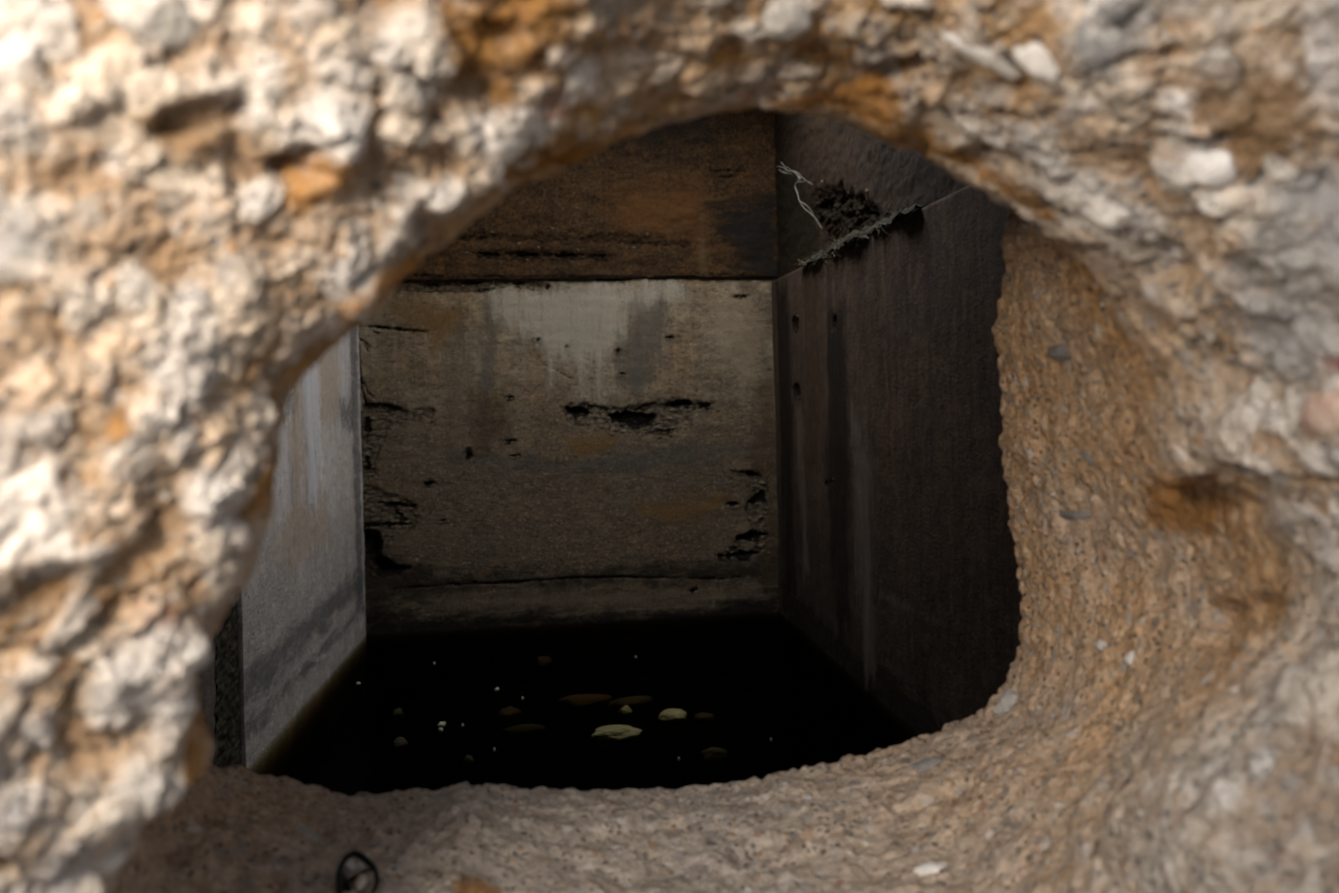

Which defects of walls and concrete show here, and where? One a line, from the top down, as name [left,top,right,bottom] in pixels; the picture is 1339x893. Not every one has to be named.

rust [519,133,594,181]
spalling [360,398,438,577]
water stain [247,281,948,738]
spalling [559,397,719,438]
spalling [717,471,770,560]
spalling [212,600,242,769]